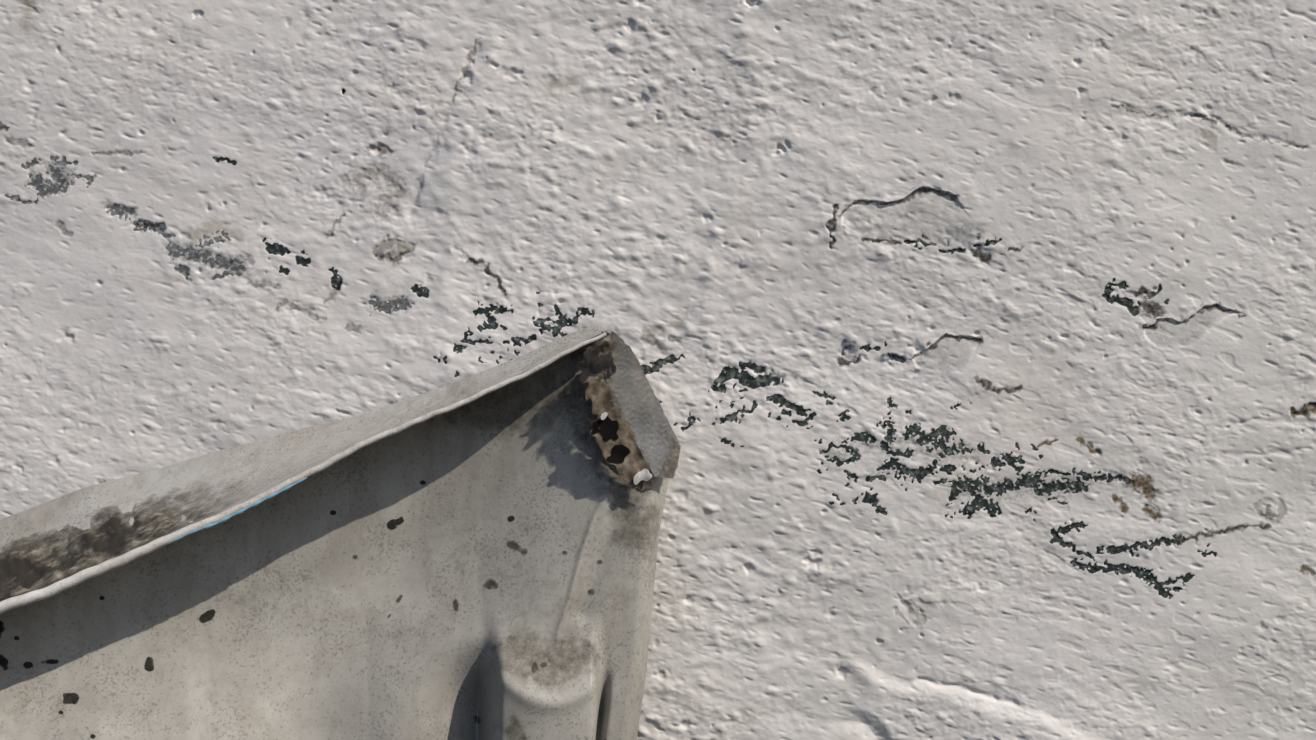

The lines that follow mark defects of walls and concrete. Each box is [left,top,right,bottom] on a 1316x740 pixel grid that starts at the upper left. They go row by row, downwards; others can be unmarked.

peeling [4,156,97,204]
flaking render [354,145,399,206]
peeling [106,204,250,280]
peeling [263,238,311,288]
peeling [328,267,343,295]
flaking render [373,239,414,265]
peeling [364,284,429,316]
peeling [433,258,595,377]
peeling [838,329,984,366]
peeling [674,361,1135,521]
peeling [1049,521,1258,599]